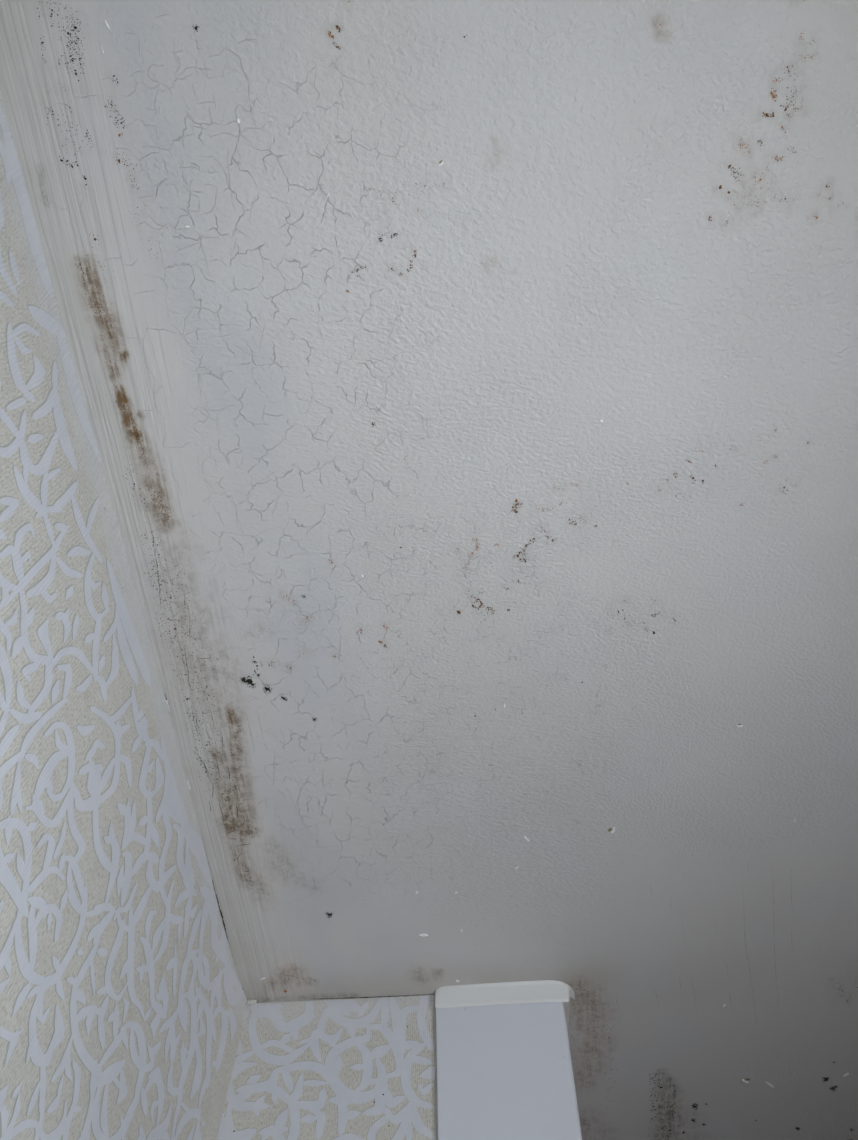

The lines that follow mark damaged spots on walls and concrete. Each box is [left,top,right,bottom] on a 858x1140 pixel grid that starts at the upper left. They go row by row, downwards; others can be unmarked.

crack [74,14,272,295]
water stain [76,260,253,884]
crack [153,544,251,872]
water stain [240,656,288,701]